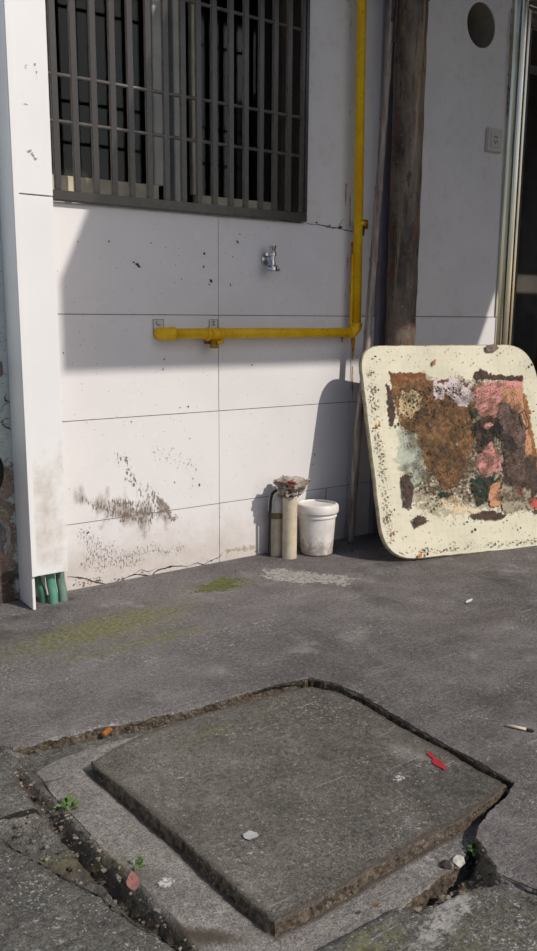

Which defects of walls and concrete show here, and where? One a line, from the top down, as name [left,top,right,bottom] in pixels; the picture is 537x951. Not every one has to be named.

crack [307,219,353,232]
damp [82,454,178,529]
peeling [0,460,18,596]
crack [69,552,223,584]
crack [498,873,537,891]